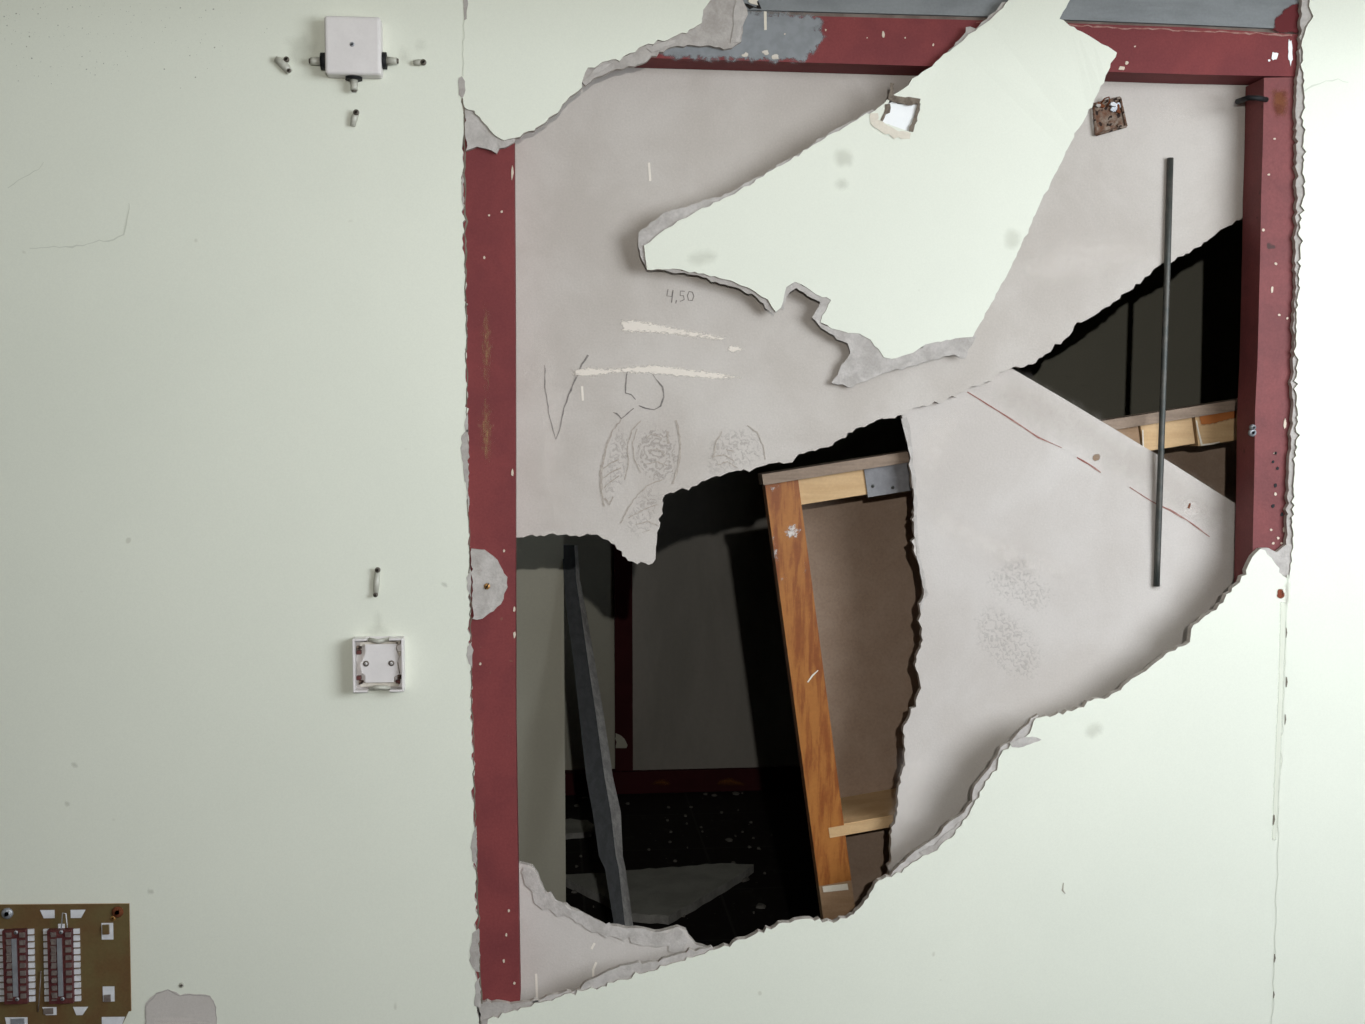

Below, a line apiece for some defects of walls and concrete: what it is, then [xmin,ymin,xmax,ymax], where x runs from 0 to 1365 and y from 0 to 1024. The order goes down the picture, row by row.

peeling [730,0,761,43]
crack [458,0,468,417]
spalling [461,415,488,504]
spalling [901,417,929,609]
crack [467,460,488,1024]
peeling [615,733,628,748]
peeling [1009,737,1041,748]
peeling [920,821,961,855]
crack [1271,575,1289,1024]
spalling [521,867,688,953]
spalling [469,928,481,1007]